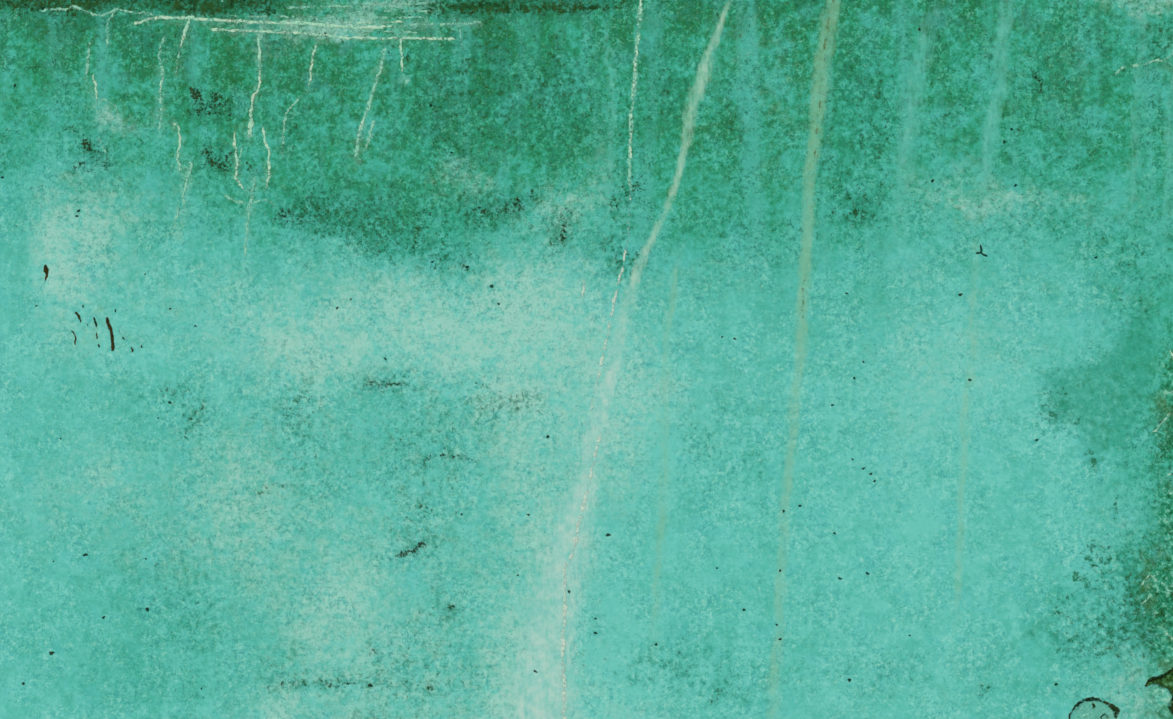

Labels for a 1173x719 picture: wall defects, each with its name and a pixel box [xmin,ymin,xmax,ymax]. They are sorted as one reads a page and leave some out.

crack [16,0,481,256]
leakage [477,0,734,719]
leakage [1025,299,1173,480]
leakage [986,610,1089,668]
spalling [1068,697,1120,719]
peeling [1131,473,1173,719]